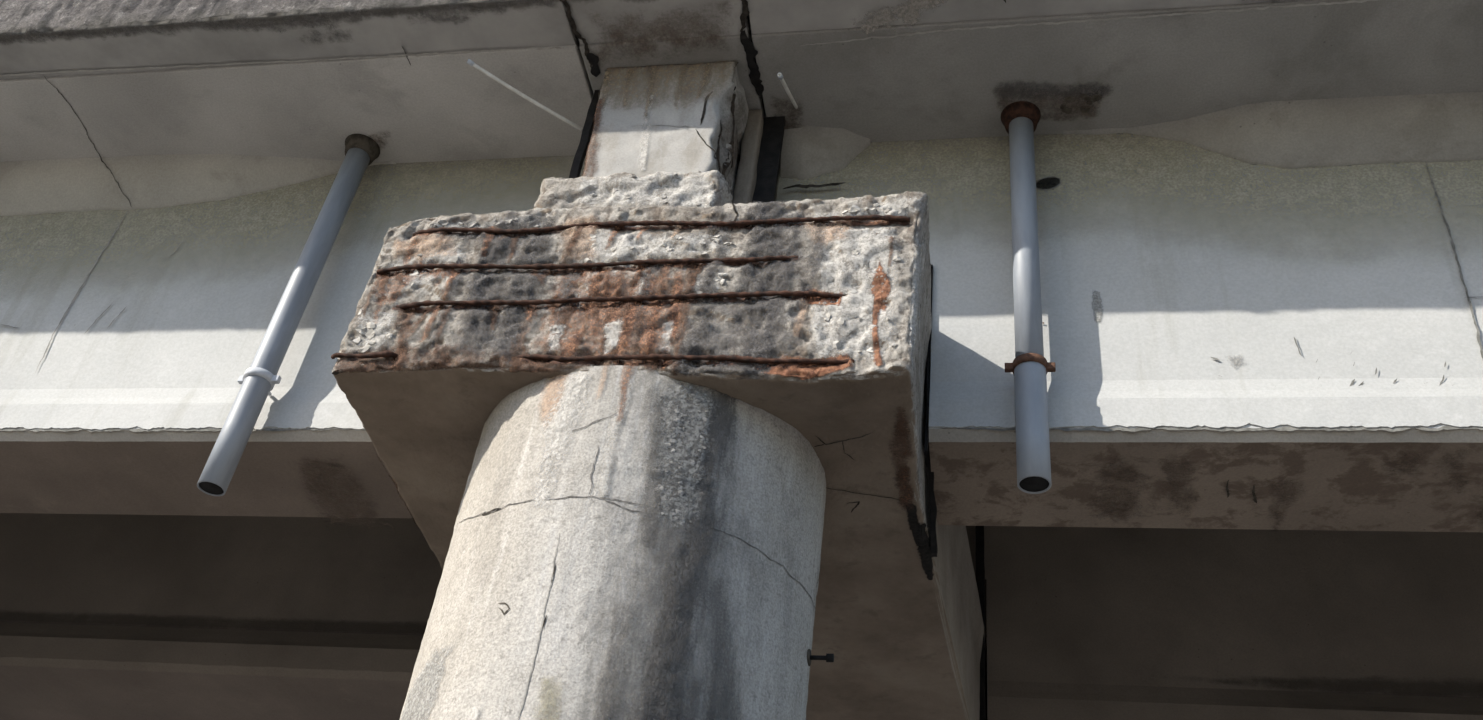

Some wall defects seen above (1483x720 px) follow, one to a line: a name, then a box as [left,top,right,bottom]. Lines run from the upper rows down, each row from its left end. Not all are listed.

leakage [0,173,338,266]
leakage [3,0,553,42]
leakage [429,213,589,355]
crack [559,0,601,77]
rust [335,216,909,421]
spalling [331,173,923,365]
leakage [604,257,664,365]
crack [637,0,764,231]
leakage [994,82,1483,219]
crack [1426,163,1483,358]
leakage [632,136,1011,720]
crack [461,408,818,718]